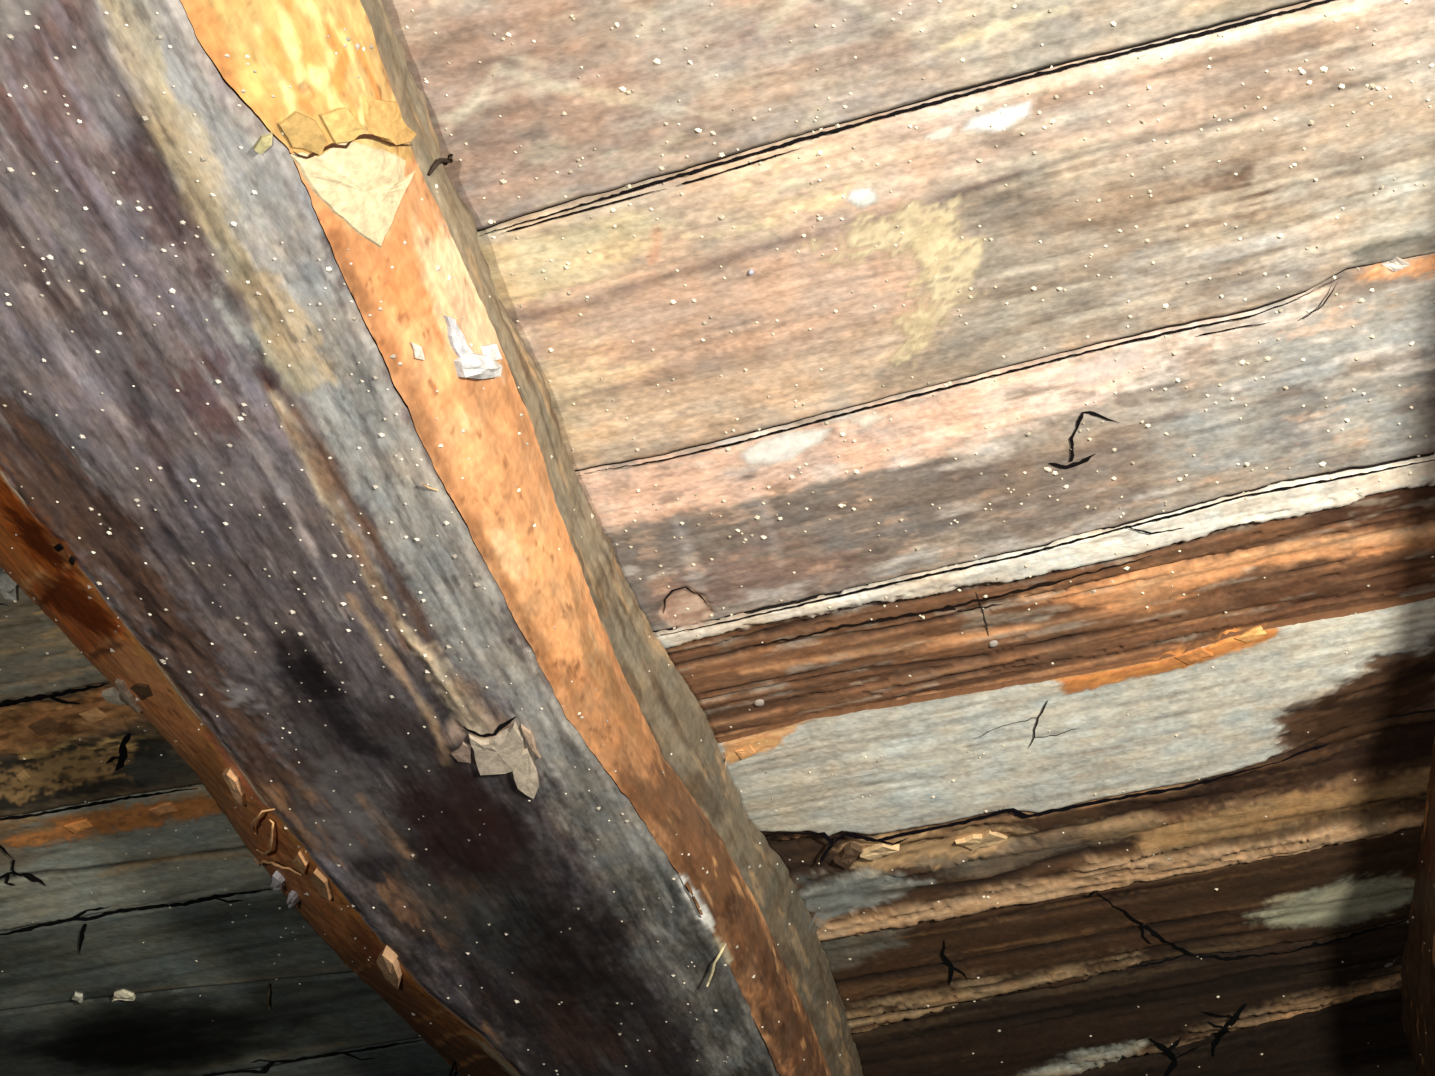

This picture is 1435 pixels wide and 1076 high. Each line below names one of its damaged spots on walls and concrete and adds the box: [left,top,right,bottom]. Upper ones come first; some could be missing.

leakage [280,638,382,754]
leakage [1281,636,1435,753]